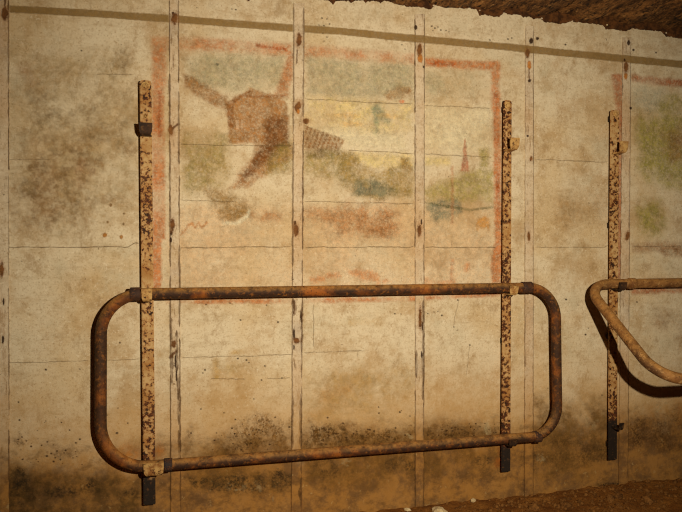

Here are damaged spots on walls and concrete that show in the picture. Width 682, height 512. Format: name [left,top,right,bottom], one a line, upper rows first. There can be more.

peeling [405,0,436,10]
peeling [460,6,682,39]